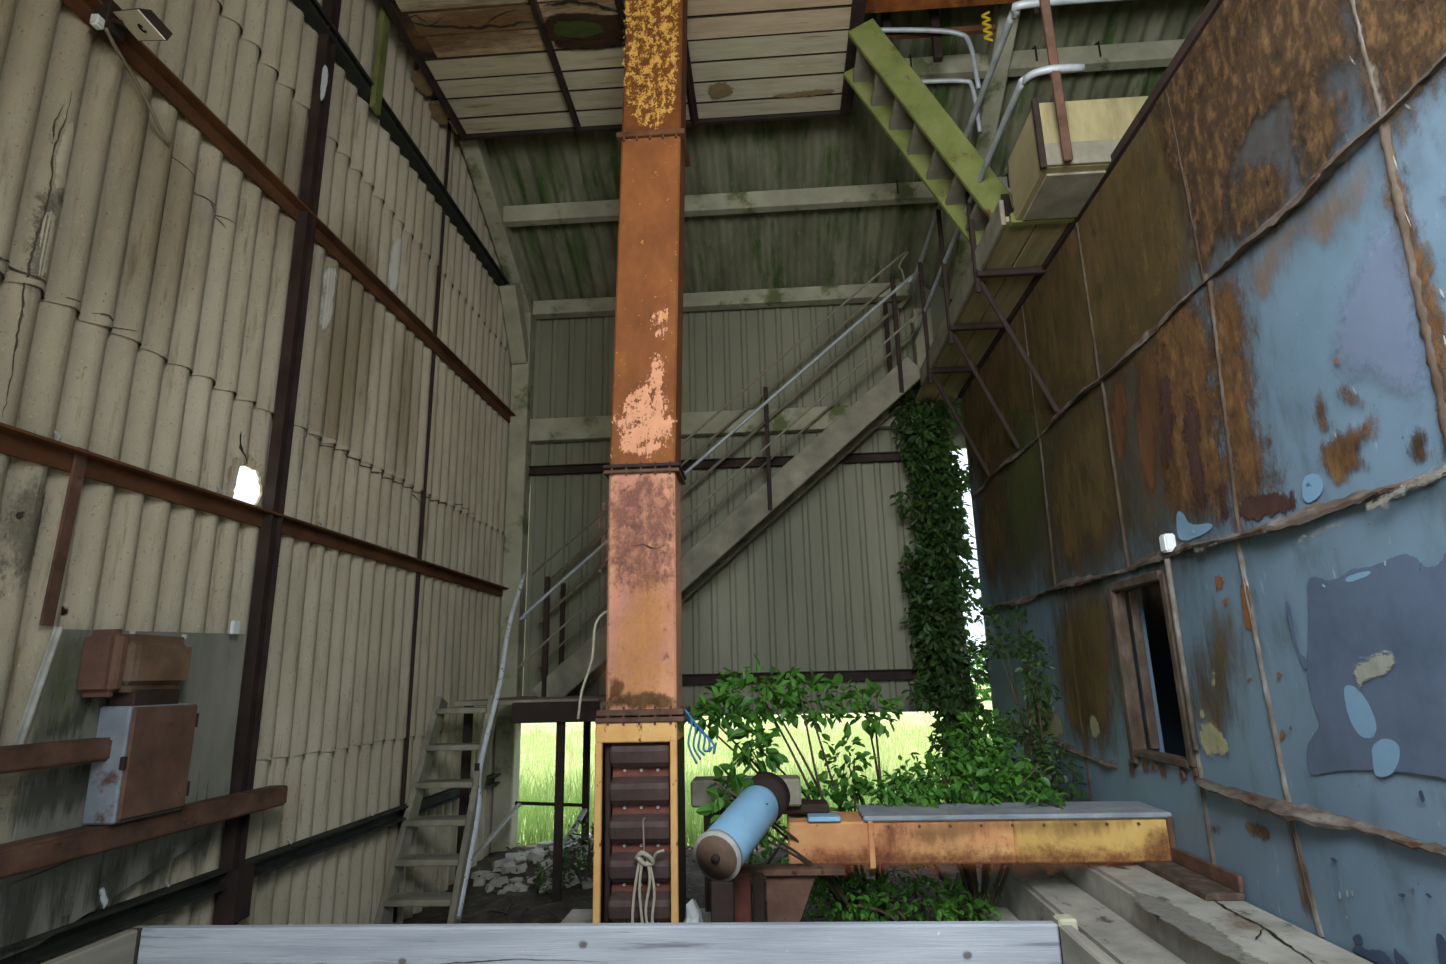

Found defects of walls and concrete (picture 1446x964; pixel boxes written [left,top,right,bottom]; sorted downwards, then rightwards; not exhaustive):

crack [2,91,72,418]
peeling [610,305,676,463]
rust [608,476,674,593]
rust [605,680,675,709]